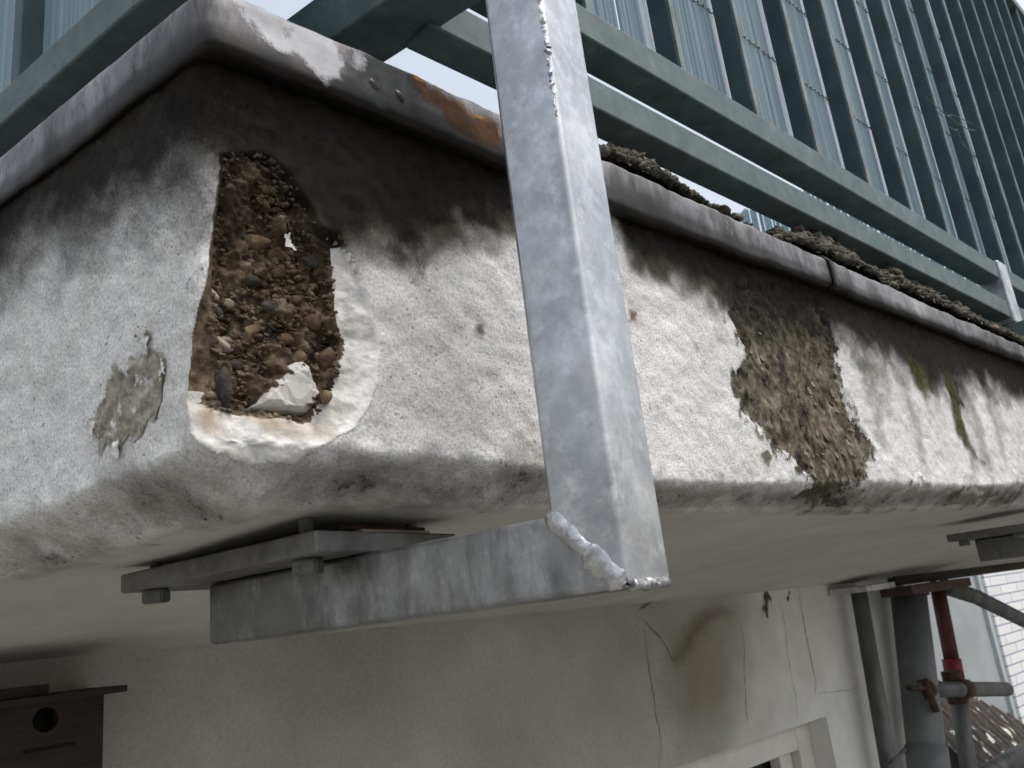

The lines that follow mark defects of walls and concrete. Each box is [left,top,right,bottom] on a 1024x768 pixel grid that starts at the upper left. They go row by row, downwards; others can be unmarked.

leakage [0,60,515,285]
corrosion [413,75,501,146]
peeling [86,329,166,459]
spalling [186,151,382,465]
peeling [724,279,877,515]
leakage [620,218,1024,464]